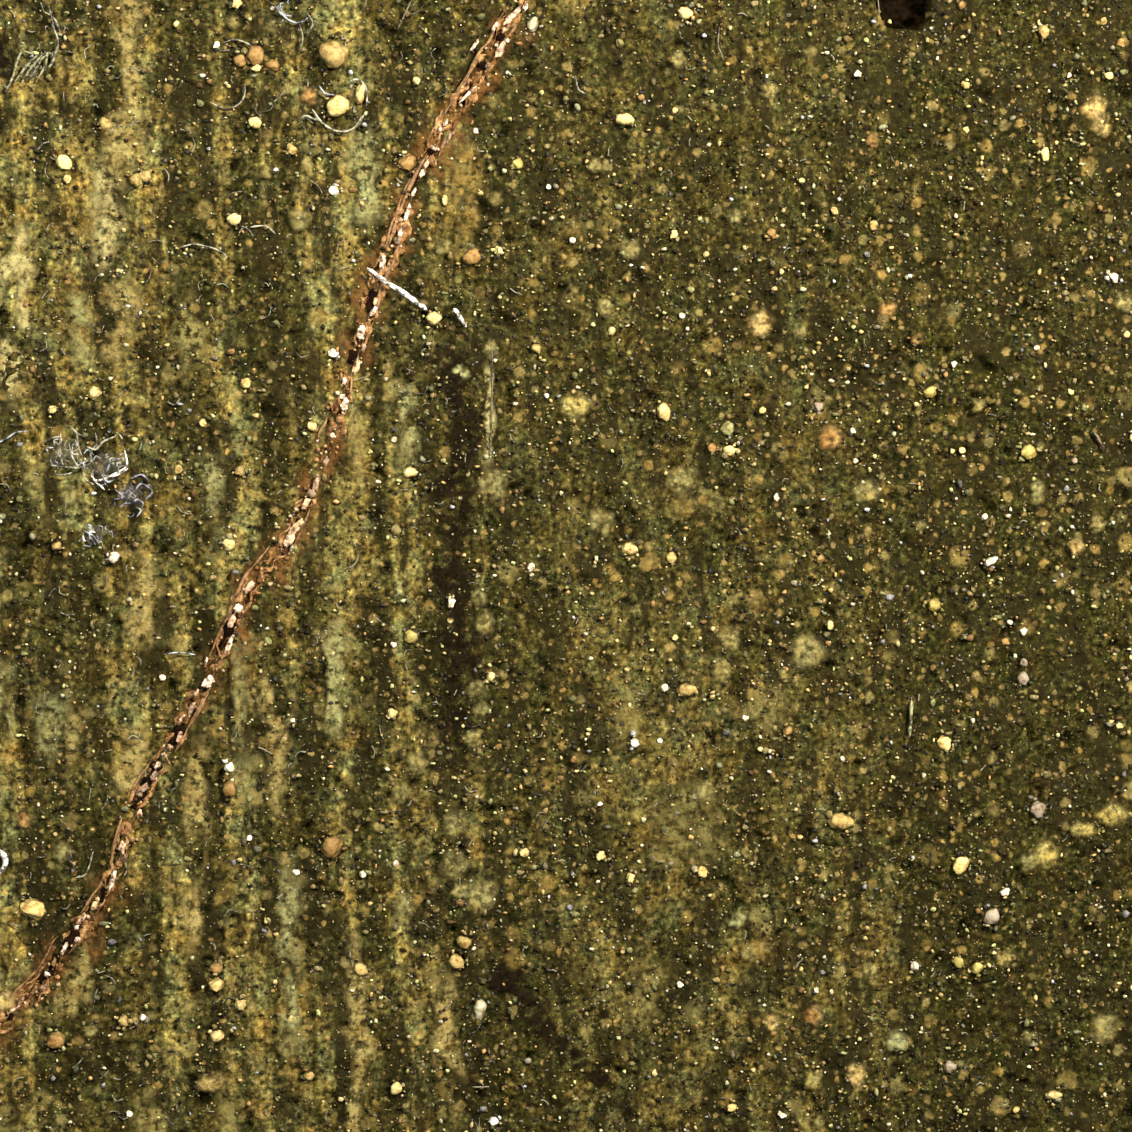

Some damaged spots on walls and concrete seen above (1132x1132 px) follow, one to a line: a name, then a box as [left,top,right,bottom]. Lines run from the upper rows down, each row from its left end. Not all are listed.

water stain [0,33,18,77]
water stain [433,349,485,742]